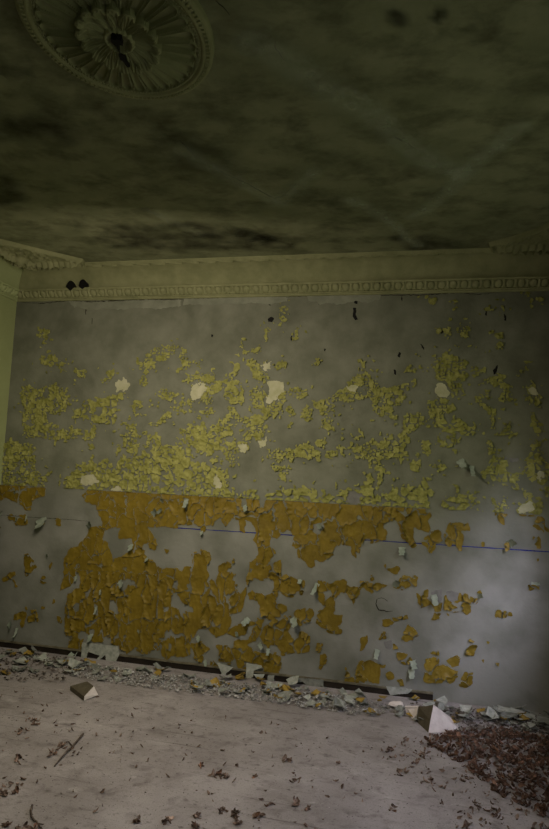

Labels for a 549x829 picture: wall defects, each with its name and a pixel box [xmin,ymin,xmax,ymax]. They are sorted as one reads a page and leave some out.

peeling [0,299,549,673]
peeling [344,615,490,688]